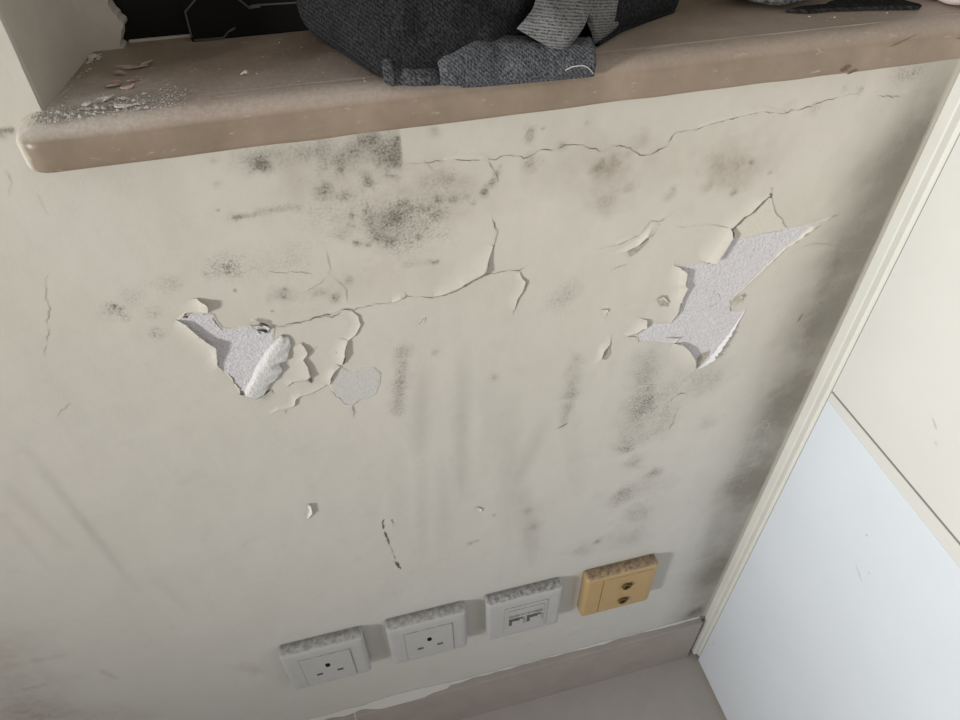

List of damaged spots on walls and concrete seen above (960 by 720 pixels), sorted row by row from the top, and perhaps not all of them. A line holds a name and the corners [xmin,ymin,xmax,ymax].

leakage [361,135,401,167]
crack [414,94,849,180]
crack [270,219,527,326]
peeling [594,188,837,374]
leakage [766,114,932,430]
peeling [173,298,381,418]
leakage [730,455,771,502]
leakage [702,556,729,585]